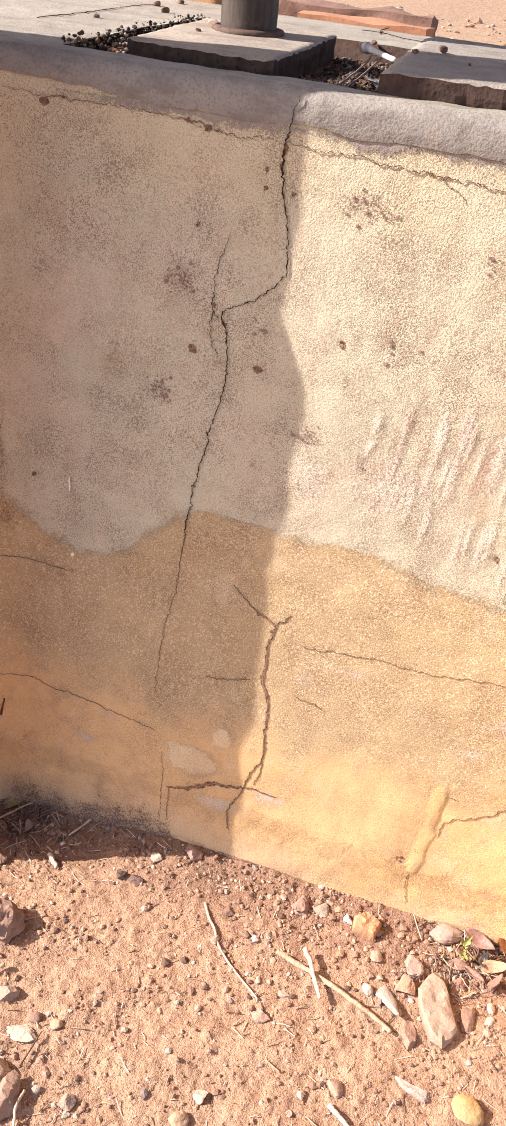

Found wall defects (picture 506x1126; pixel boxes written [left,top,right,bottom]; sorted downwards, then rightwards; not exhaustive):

crack [37,4,153,18]
crack [3,85,506,692]
crack [0,585,291,830]
water stain [0,390,506,936]
crack [419,798,506,842]